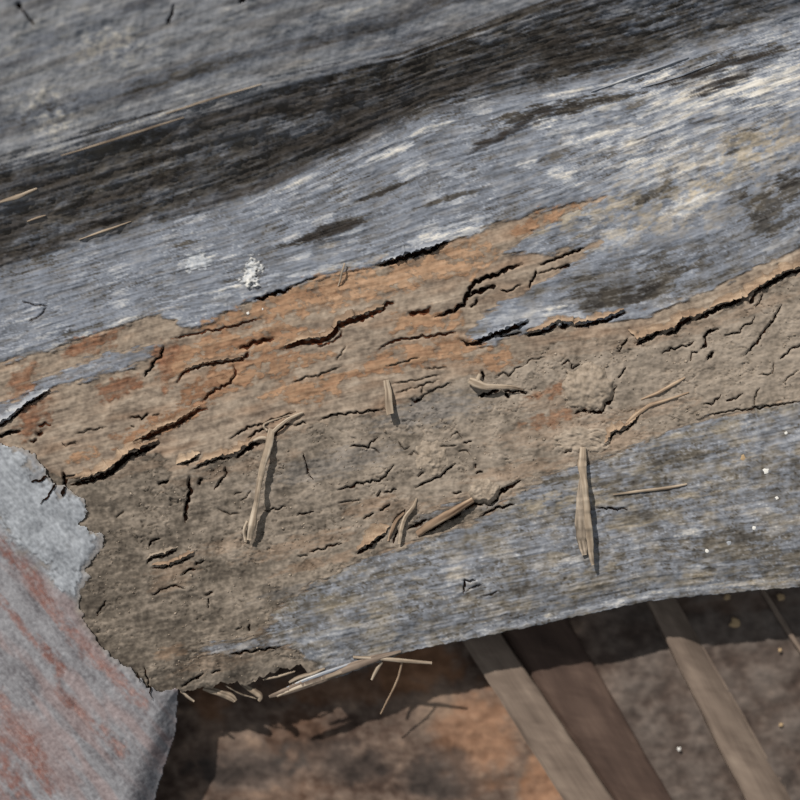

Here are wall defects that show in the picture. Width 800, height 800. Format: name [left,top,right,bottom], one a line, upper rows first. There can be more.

crack [0,392,50,443]
peeling [147,546,194,565]
crack [147,538,204,595]
crack [31,277,393,504]
leakage [238,254,264,288]
crack [182,408,385,522]
peeling [339,523,448,569]
peeling [0,196,800,480]
crack [379,242,449,266]
crack [339,431,521,554]
crack [379,248,626,403]
crack [574,269,800,416]